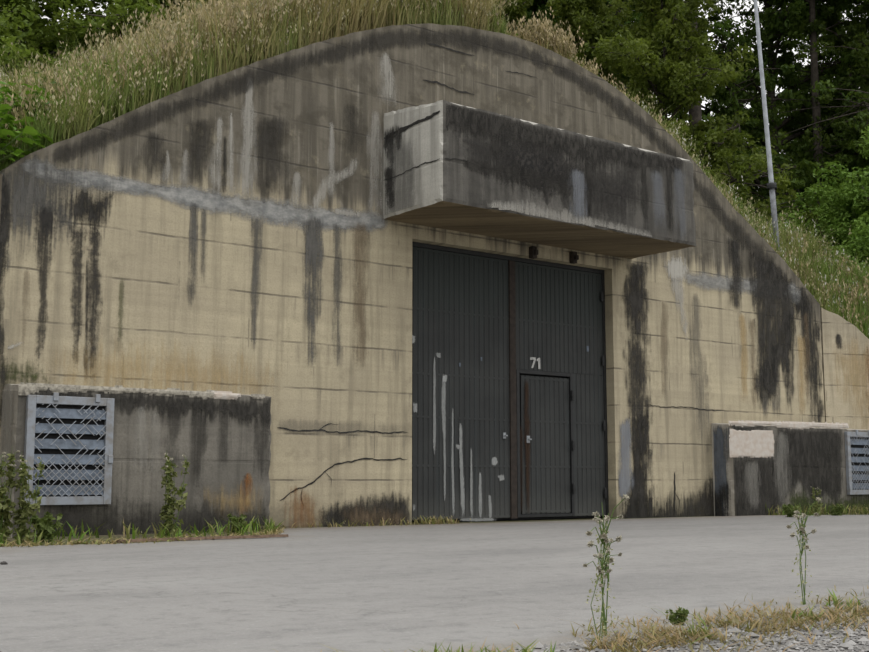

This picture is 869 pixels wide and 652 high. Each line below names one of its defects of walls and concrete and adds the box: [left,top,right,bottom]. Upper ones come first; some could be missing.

damp [0,29,676,420]
damp [619,177,843,519]
damp [30,388,271,456]
crack [277,423,408,434]
crack [280,458,407,510]